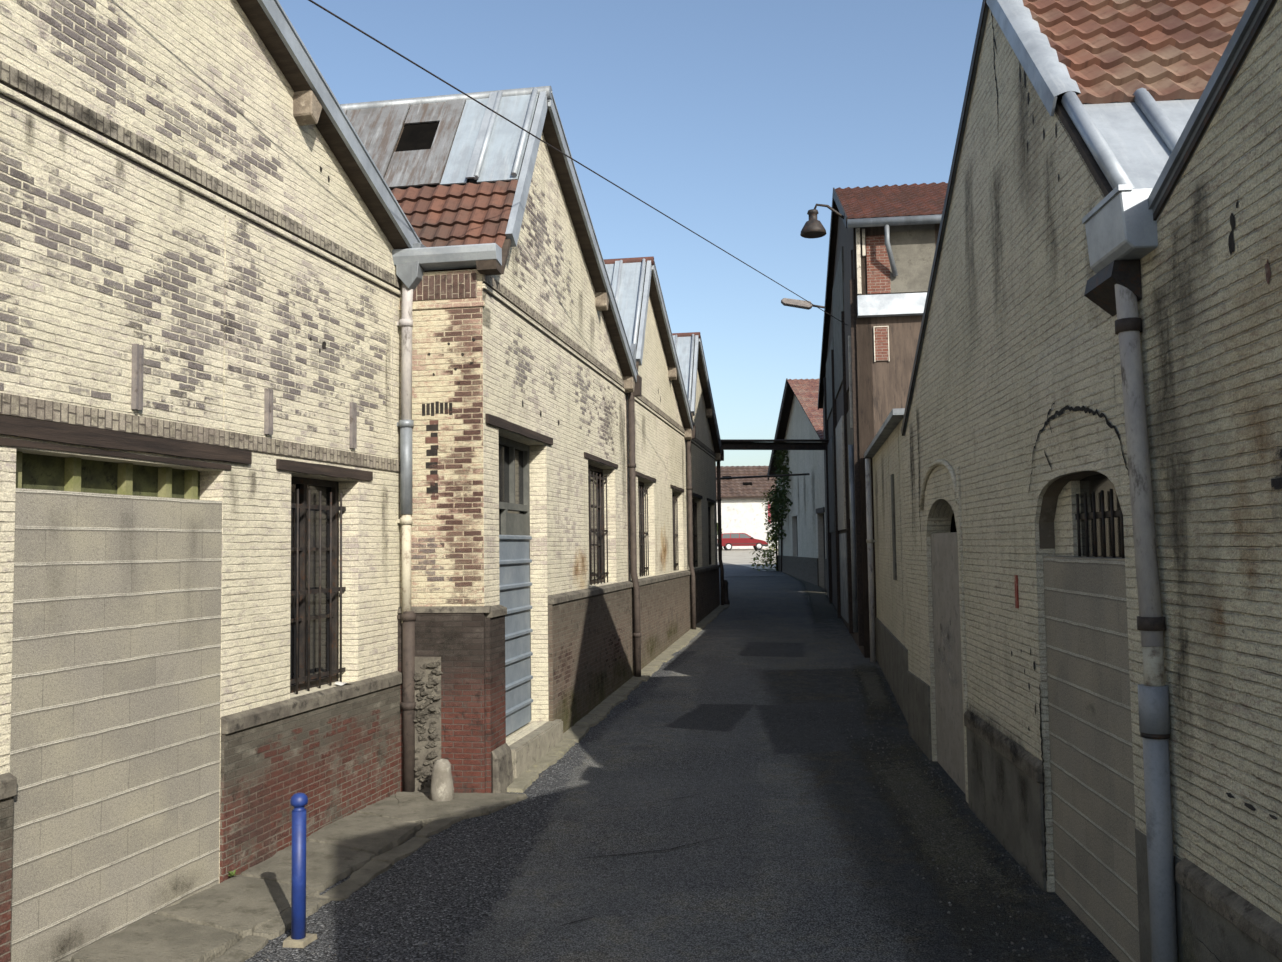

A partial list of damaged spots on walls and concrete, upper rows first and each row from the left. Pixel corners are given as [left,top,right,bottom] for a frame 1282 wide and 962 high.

spalling [1271,449,1282,490]